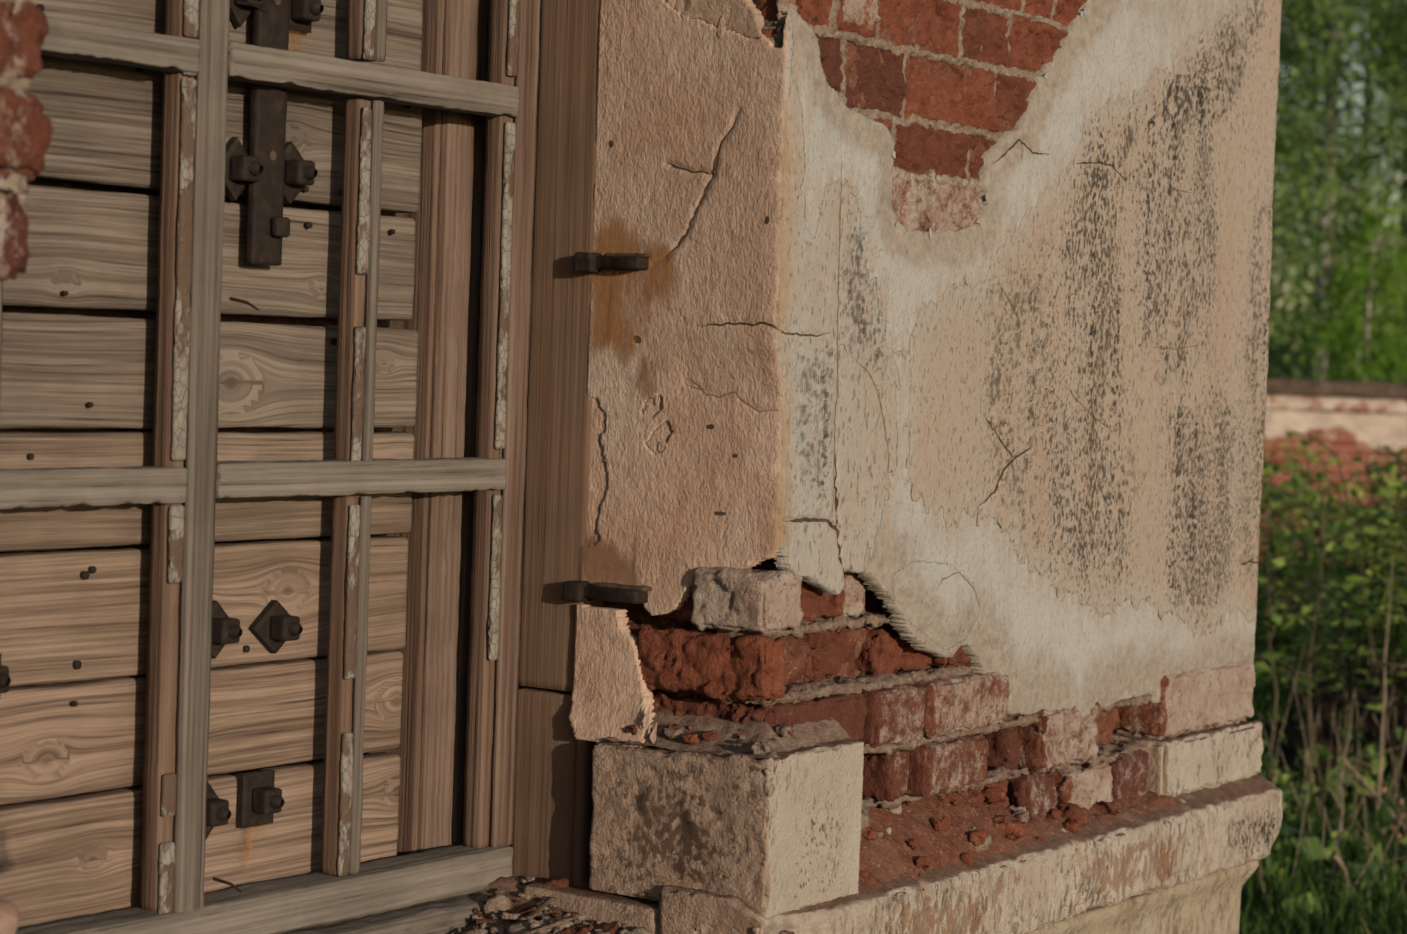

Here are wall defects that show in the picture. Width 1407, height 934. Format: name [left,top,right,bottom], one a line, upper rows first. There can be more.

rust [594,223,674,350]
crack [654,110,739,264]
crack [699,166,889,574]
spalling [568,0,1264,896]
water stain [969,0,1274,640]